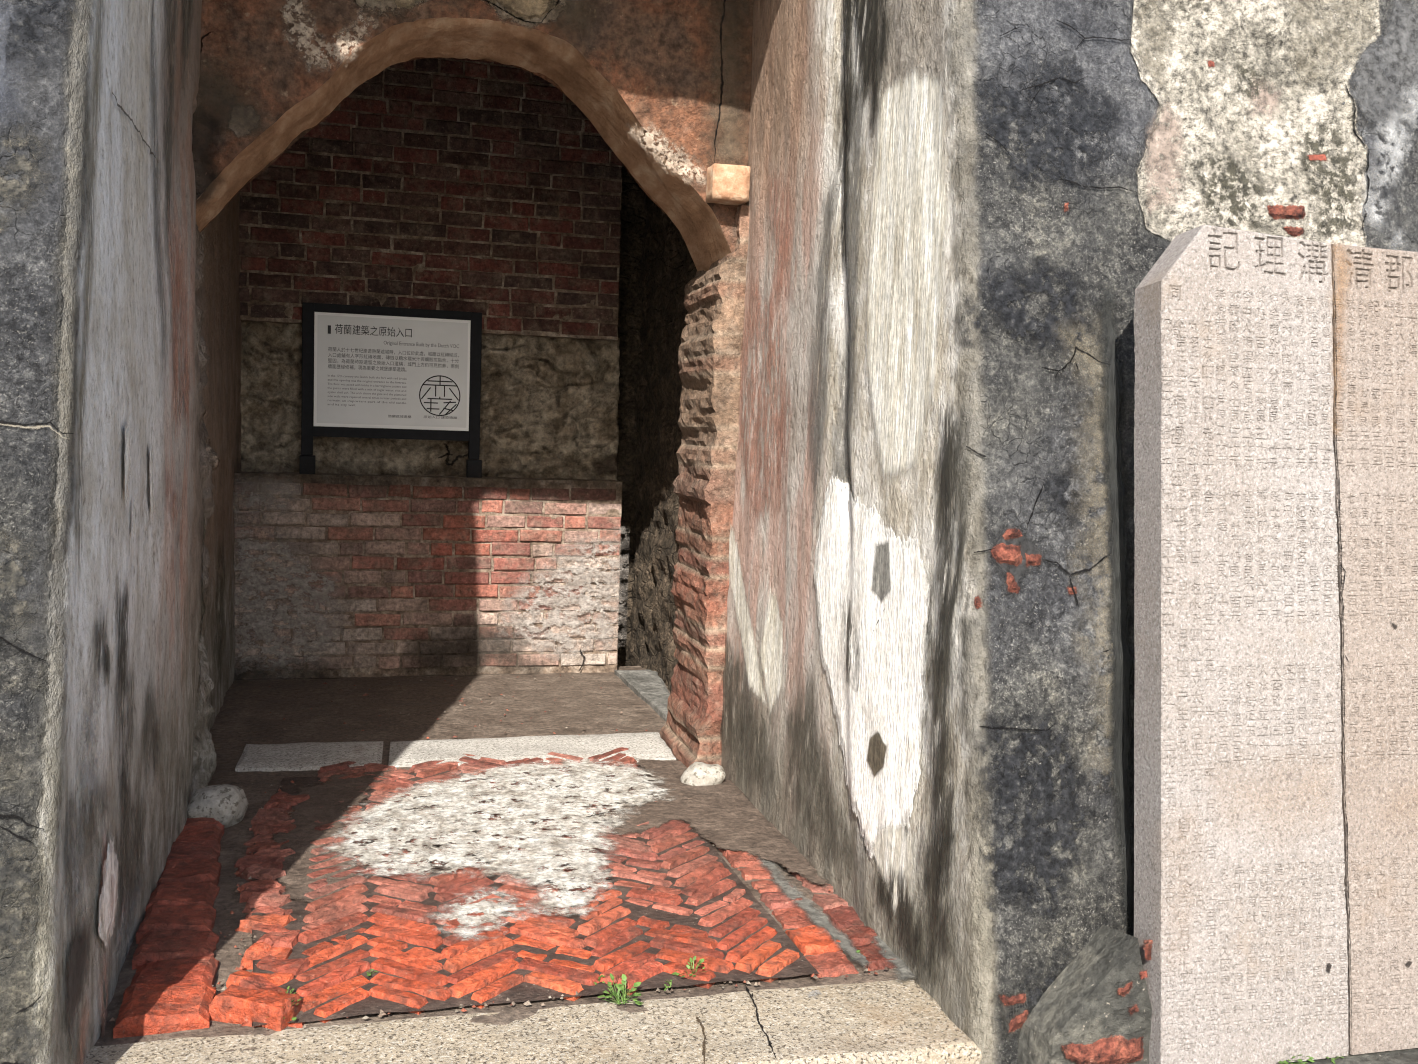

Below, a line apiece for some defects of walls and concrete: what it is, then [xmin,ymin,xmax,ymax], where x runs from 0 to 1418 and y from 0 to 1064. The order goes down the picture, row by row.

peeling [483,0,568,28]
crack [112,92,159,163]
spalling [1131,0,1381,247]
crack [0,418,74,439]
peeling [1041,465,1085,517]
spalling [991,526,1043,597]
peeling [814,476,932,861]
water stain [66,581,161,1051]
peeling [98,839,118,946]
crack [696,1016,706,1063]
crack [745,985,776,1058]
spalling [1061,1035,1144,1064]